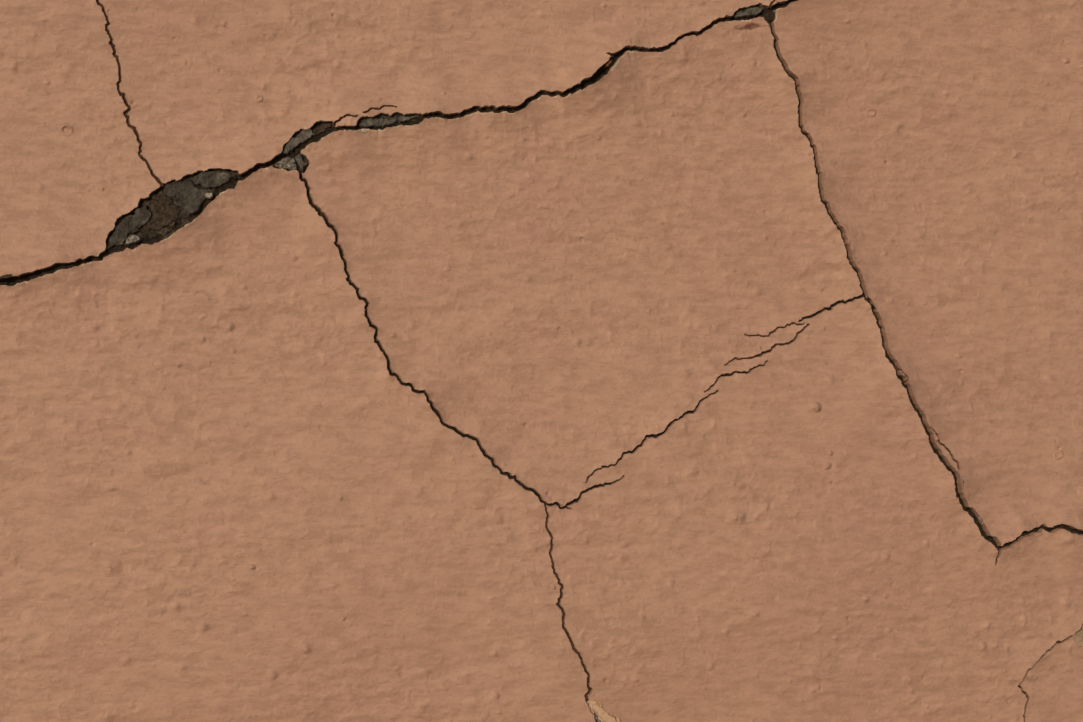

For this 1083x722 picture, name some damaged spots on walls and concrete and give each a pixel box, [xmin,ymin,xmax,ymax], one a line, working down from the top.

spalling [106,169,242,250]
crack [586,25,1083,565]
crack [0,0,798,702]
spalling [587,700,620,722]
crack [1018,624,1083,717]